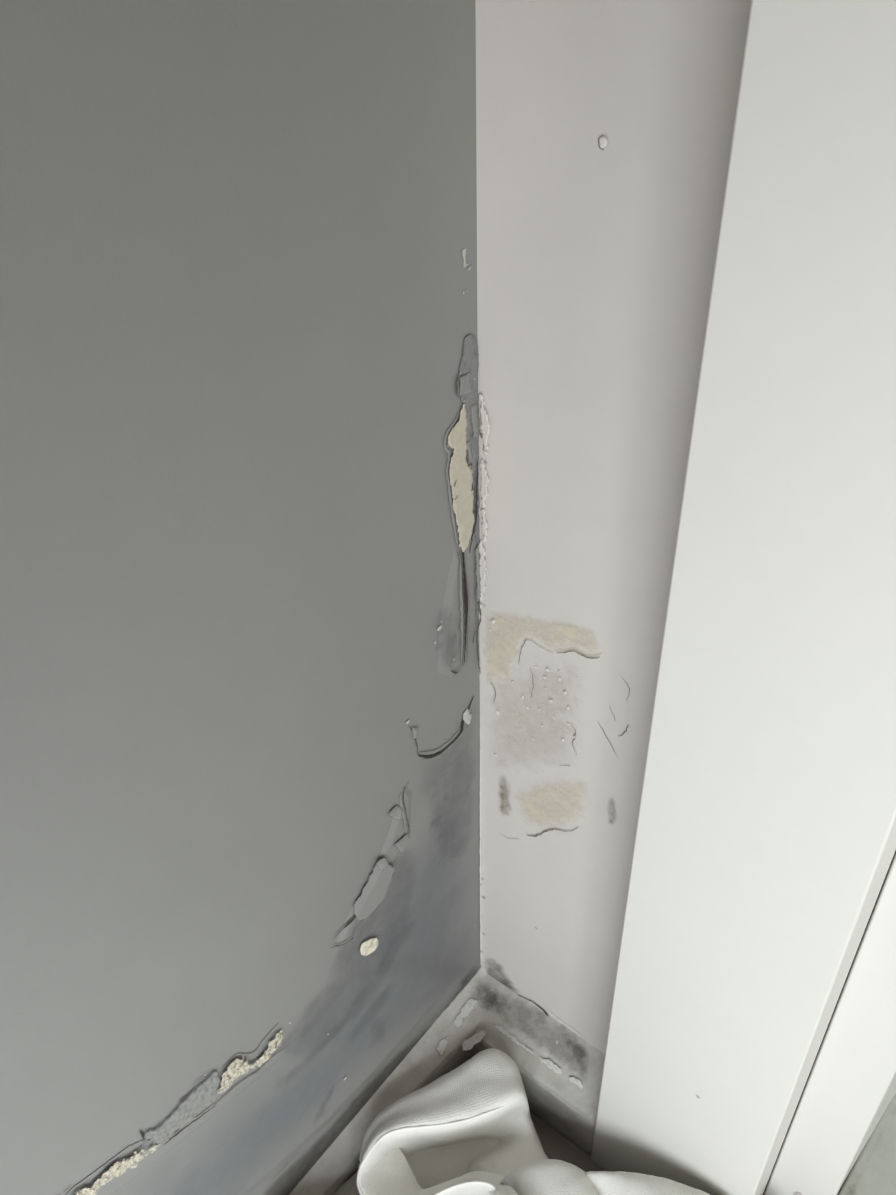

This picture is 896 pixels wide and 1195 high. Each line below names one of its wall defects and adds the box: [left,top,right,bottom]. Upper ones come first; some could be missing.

flaking render [444,334,495,631]
peeling [358,935,378,956]
peeling [354,858,394,921]
peeling [479,739,496,968]
peeling [66,1022,291,1195]